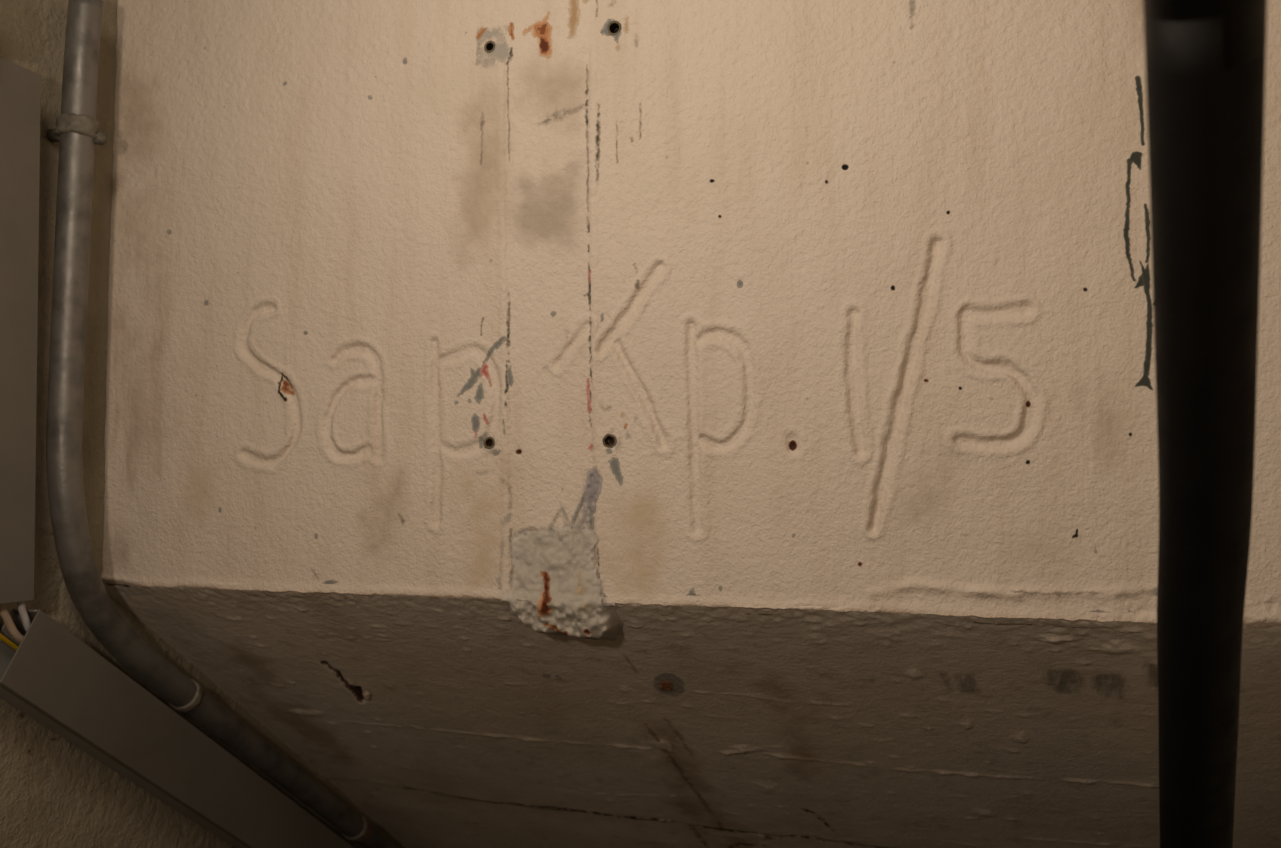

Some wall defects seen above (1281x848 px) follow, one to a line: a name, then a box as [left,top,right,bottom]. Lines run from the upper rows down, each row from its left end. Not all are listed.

corrosion [523,13,552,58]
corrosion [568,0,588,37]
spalling [497,414,629,641]
spalling [320,661,371,702]
crack [402,719,891,848]